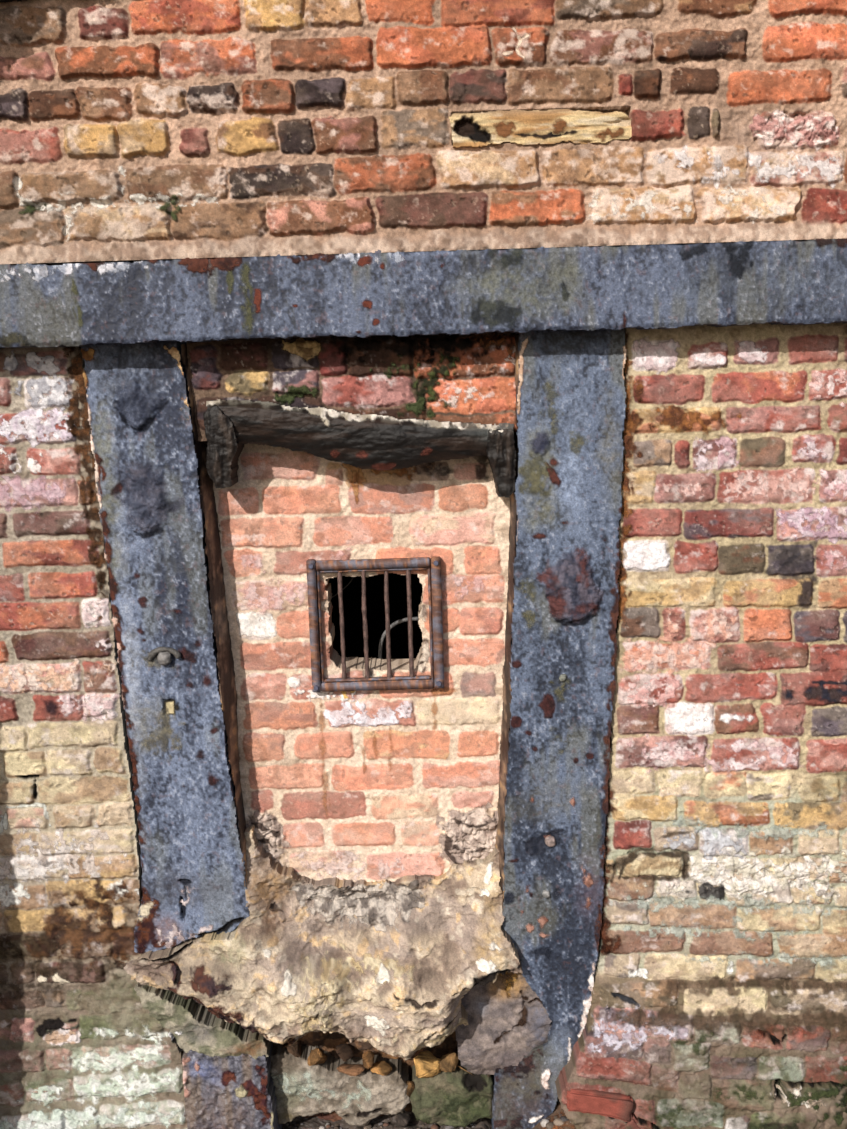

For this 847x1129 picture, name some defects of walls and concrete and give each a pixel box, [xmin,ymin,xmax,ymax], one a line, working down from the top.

damp [0,803,139,907]
spalling [246,810,290,865]
spalling [436,802,498,865]
damp [0,935,116,983]
crack [162,917,244,950]
damp [0,1029,185,1129]
crack [608,1116,659,1129]